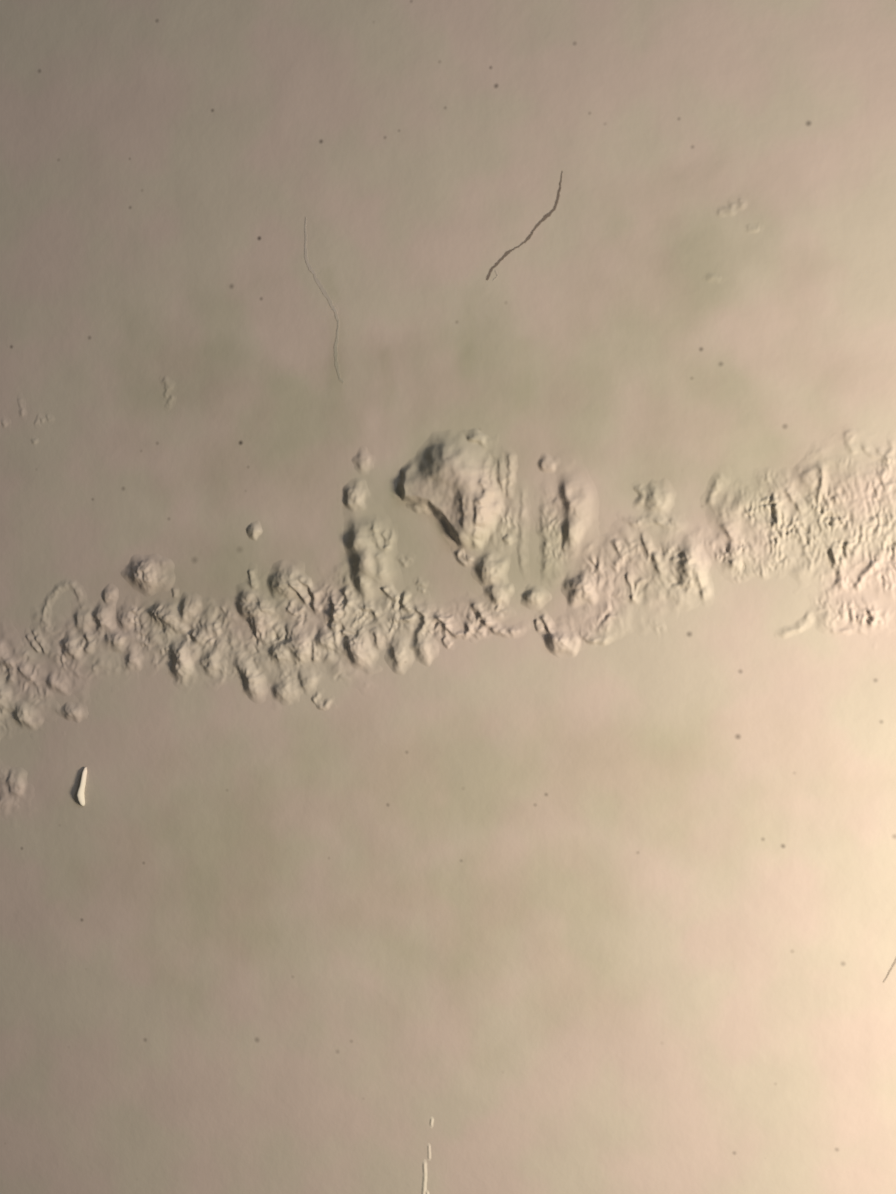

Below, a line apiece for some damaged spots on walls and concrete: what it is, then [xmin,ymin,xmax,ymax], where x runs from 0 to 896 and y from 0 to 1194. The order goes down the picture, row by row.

crack [486,171,563,281]